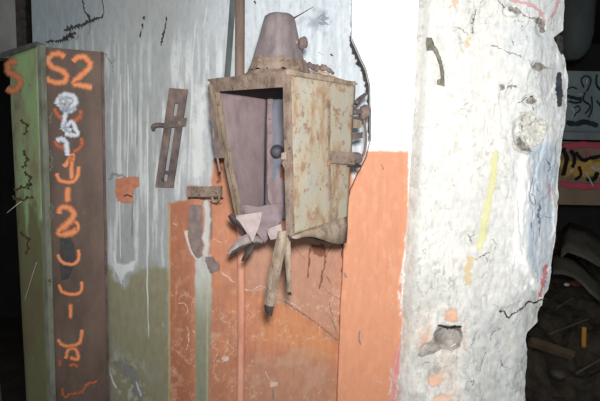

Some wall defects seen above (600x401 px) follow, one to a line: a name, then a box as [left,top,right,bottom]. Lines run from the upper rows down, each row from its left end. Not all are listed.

crack [46,0,104,44]
crack [349,19,370,141]
spalling [512,96,548,154]
flaking render [109,173,140,203]
peeling [184,200,220,273]
crack [281,283,340,341]
spalling [418,309,465,363]
crack [481,298,547,364]